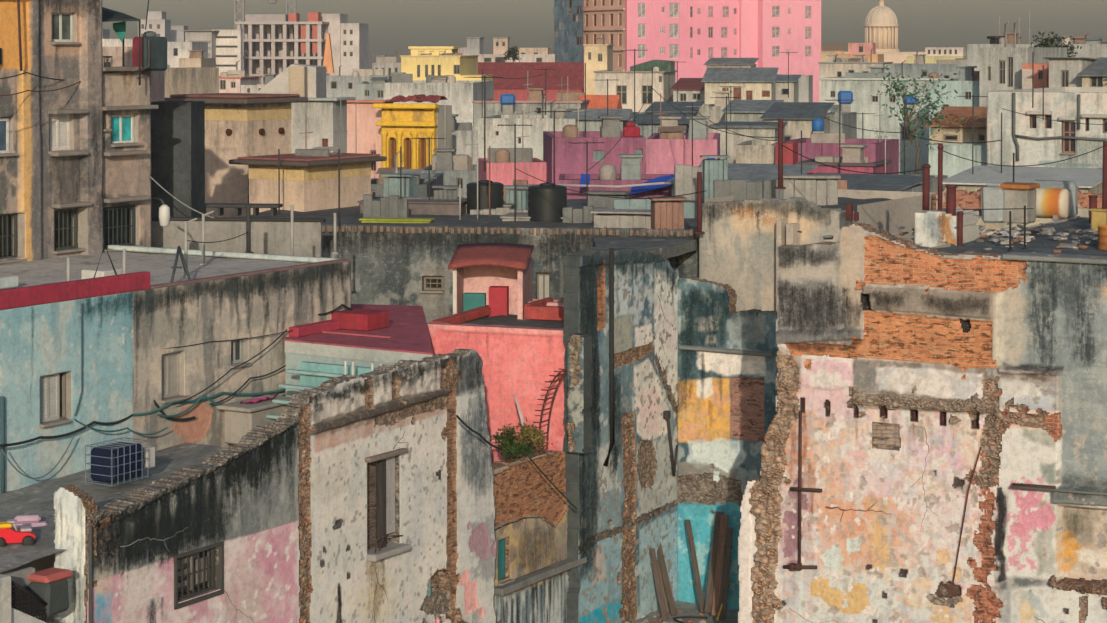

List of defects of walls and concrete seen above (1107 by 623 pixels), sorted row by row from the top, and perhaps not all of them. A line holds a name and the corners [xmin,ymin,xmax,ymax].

water stain [92,425,295,573]
water stain [84,262,350,331]
spalling [318,395,447,526]
water stain [308,229,678,582]
flaking render [454,453,568,560]
peeling [597,258,678,612]
water stain [677,286,754,412]
flaking render [785,310,996,380]
peeling [779,386,1004,623]
flaking render [855,235,1029,294]
flaking render [949,379,1077,448]
water stain [1005,261,1106,374]